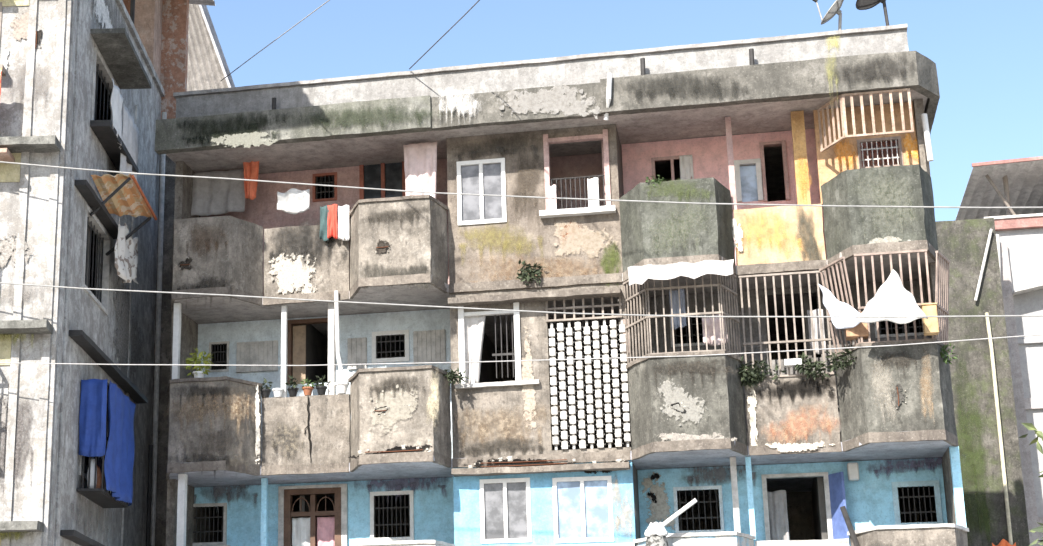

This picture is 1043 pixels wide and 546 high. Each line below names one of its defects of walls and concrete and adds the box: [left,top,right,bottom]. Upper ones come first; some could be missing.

leakage [311,106,430,126]
peeling [439,89,477,117]
peeling [490,84,605,119]
leakage [627,75,746,101]
leakage [798,210,821,260]
peeling [267,253,317,295]
leakage [758,377,833,402]
crack [304,396,312,463]
peeling [652,377,737,445]
peeling [746,384,835,453]